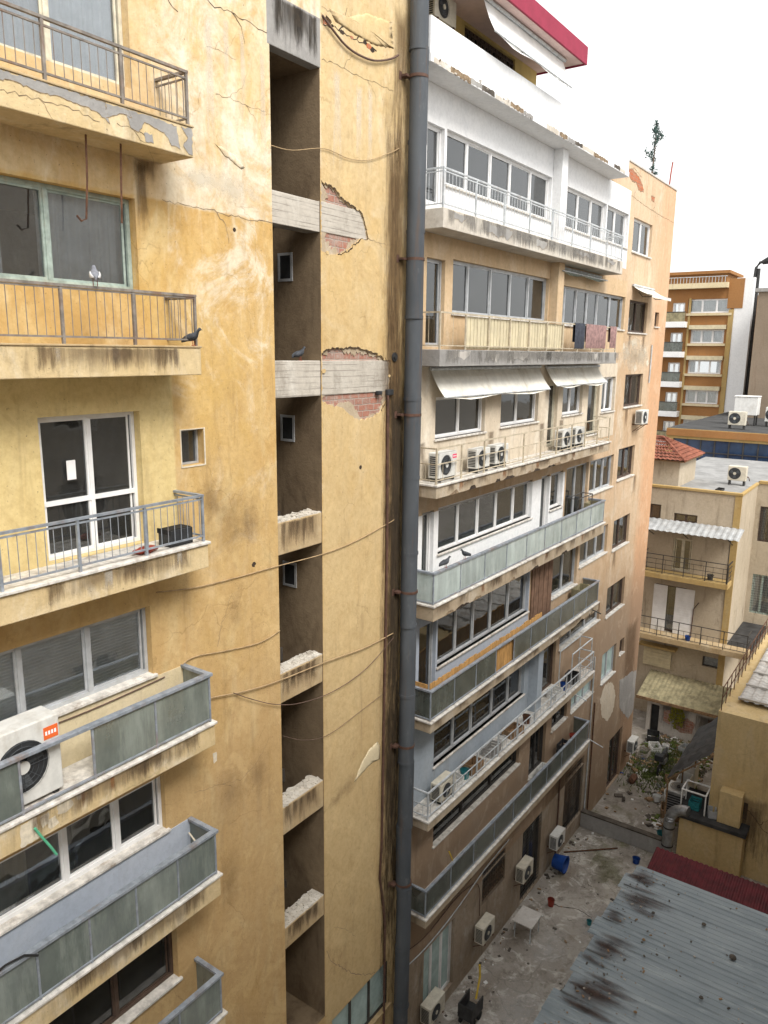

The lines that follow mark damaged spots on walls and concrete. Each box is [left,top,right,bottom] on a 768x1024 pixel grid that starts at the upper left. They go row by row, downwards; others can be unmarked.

peeling [0,70,193,156]
crack [207,0,267,133]
spalling [434,57,533,120]
spalling [547,124,655,202]
crack [162,199,272,239]
spalling [321,182,368,255]
spalling [321,346,391,420]